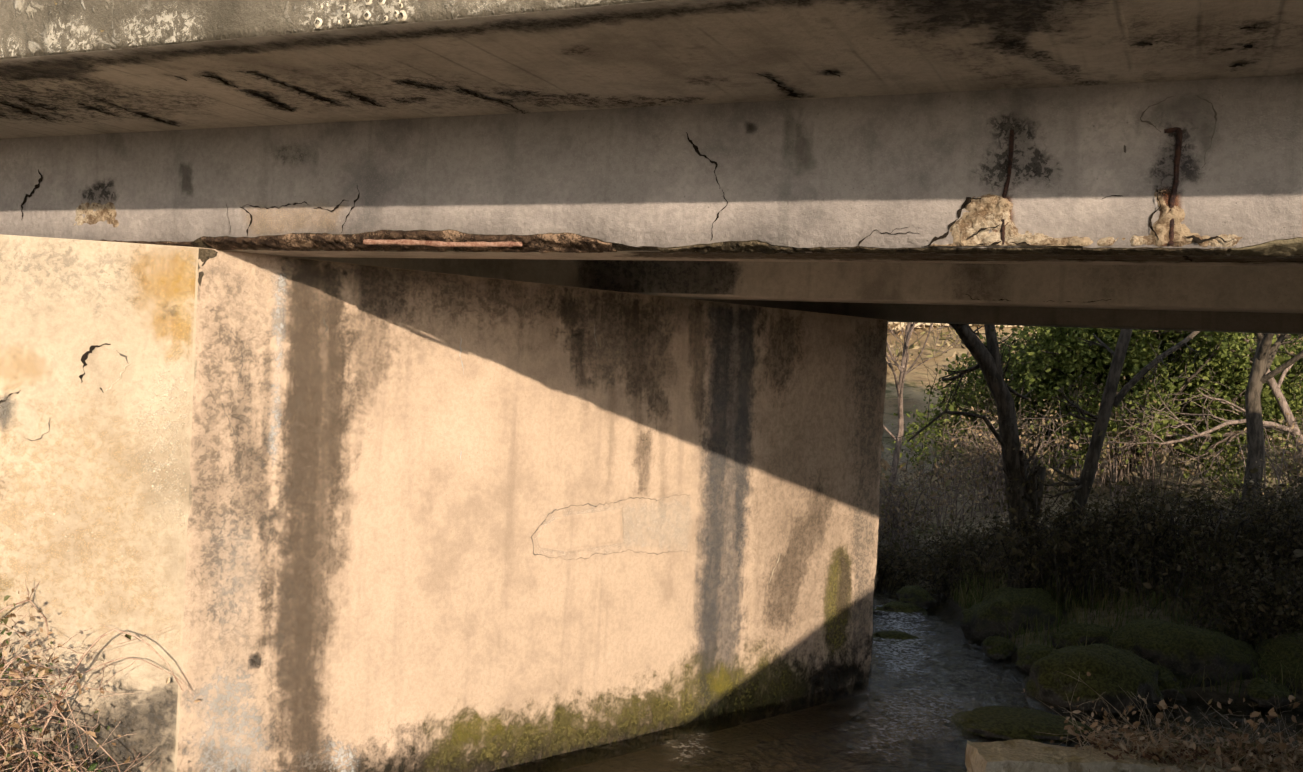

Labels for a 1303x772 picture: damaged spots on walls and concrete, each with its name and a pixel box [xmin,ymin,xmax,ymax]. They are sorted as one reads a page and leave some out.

damp [0,0,811,81]
damp [862,0,1108,85]
crack [21,169,43,220]
crack [226,188,360,236]
spalling [73,181,617,287]
damp [535,94,703,107]
crack [680,132,728,240]
spalling [656,127,1303,256]
corrosion [976,115,1059,232]
corrosion [1140,95,1217,206]
damp [200,252,1303,772]
damp [30,686,177,772]